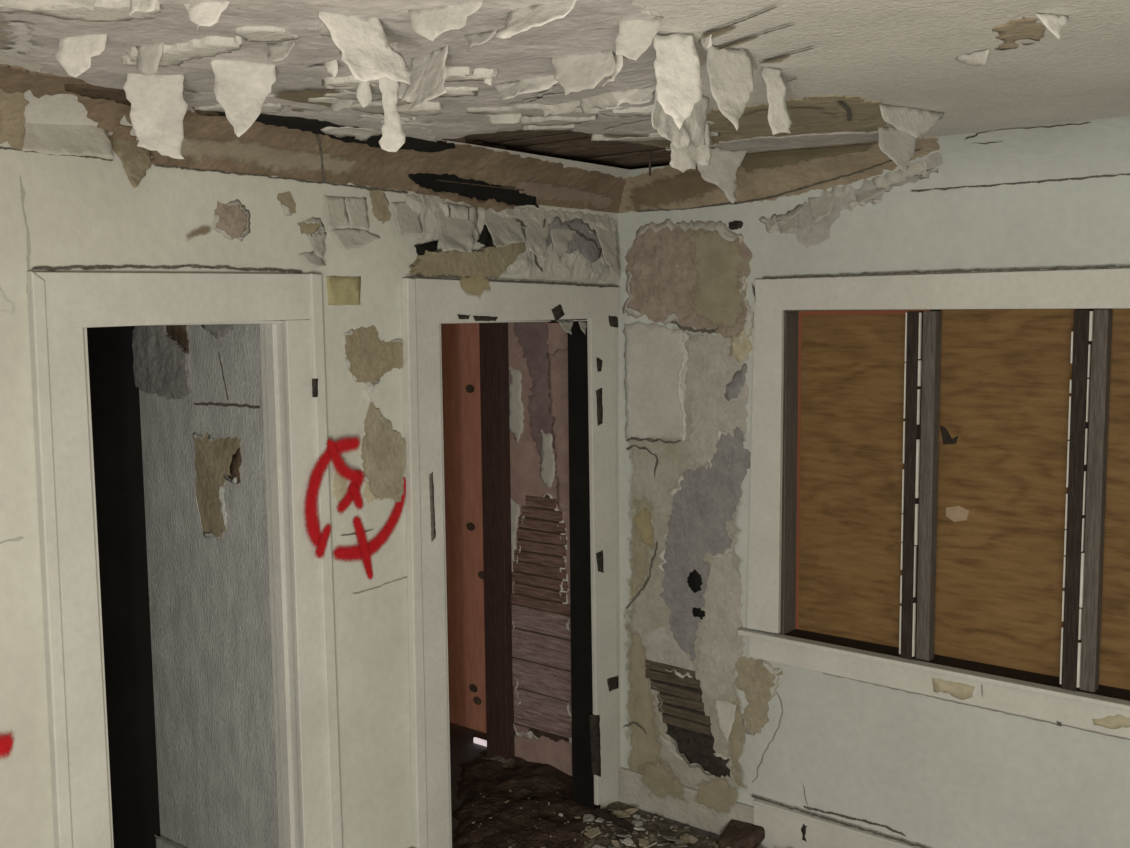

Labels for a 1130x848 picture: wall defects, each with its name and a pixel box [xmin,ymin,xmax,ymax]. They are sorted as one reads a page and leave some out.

peeling [0,0,944,812]
spalling [955,13,1069,66]